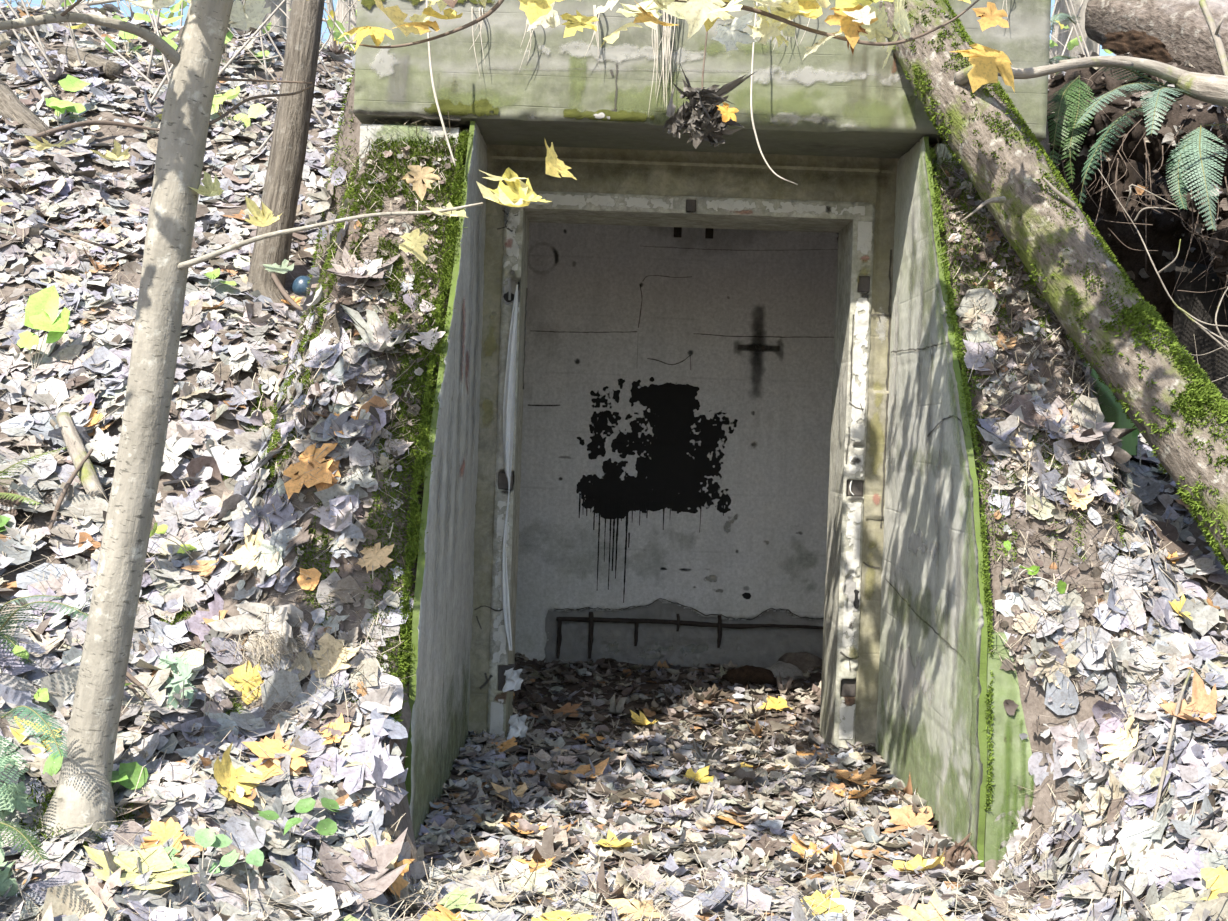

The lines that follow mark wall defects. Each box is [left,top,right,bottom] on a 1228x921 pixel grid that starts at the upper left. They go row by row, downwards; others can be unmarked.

damp [540,42,656,109]
damp [674,48,703,62]
damp [753,67,866,84]
peeling [849,298,870,477]
peeling [842,502,862,649]
spalling [545,598,824,668]
peeling [839,700,856,739]